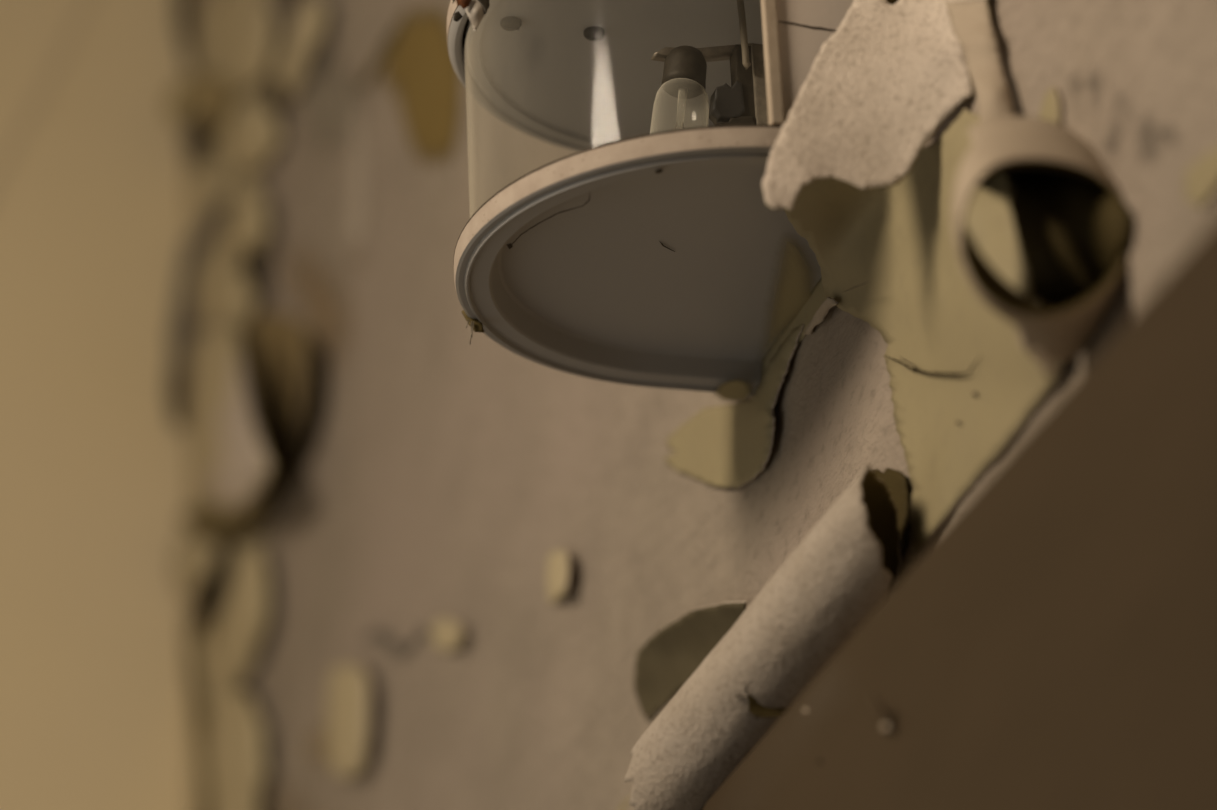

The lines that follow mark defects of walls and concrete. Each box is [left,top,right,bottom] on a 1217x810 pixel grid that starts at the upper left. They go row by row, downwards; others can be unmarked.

peeling [664,0,1062,553]
peeling [546,548,572,603]